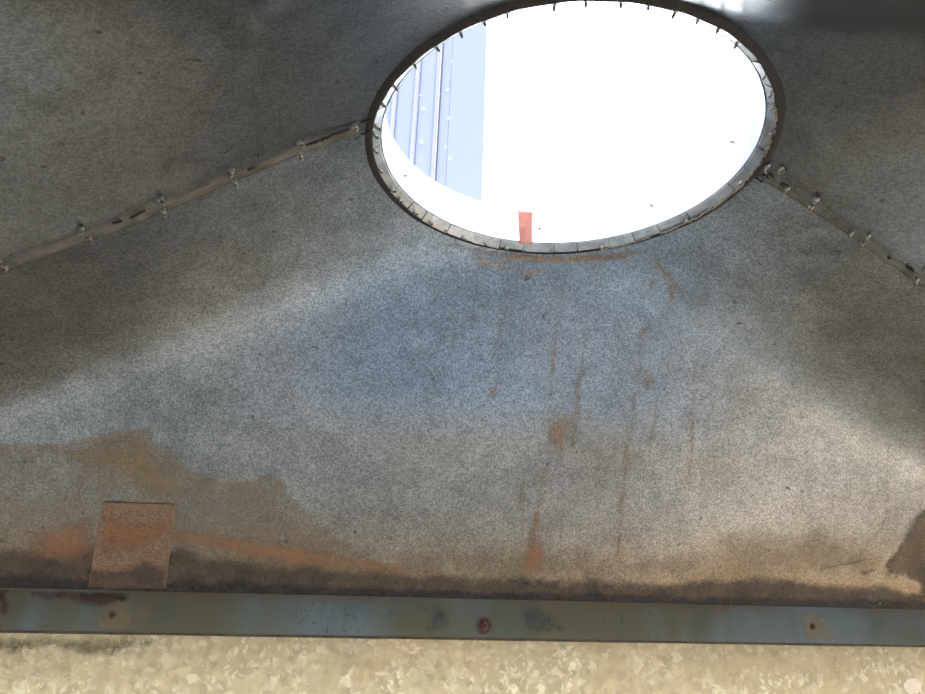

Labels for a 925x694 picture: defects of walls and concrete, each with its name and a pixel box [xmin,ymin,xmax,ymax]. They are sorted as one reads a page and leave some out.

rust [0,512,925,613]